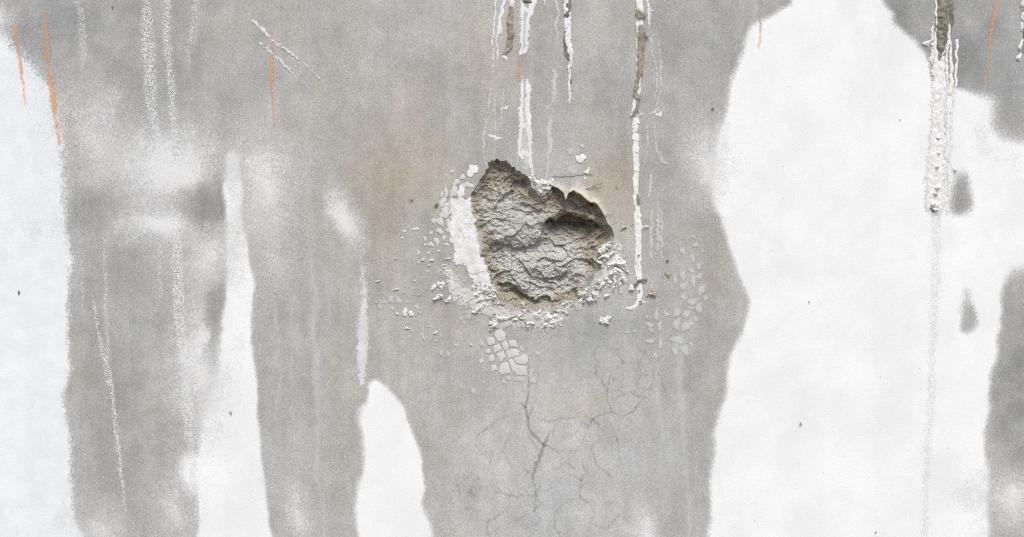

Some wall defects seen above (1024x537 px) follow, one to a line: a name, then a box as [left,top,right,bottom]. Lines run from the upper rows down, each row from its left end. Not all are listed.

rust [47,57,57,126]
damp [81,235,127,512]
damp [140,0,179,154]
damp [157,227,198,521]
damp [296,246,331,537]
damp [355,253,370,386]
spalling [401,159,614,310]
damp [482,0,574,179]
peeling [564,144,590,179]
damp [626,0,668,310]
damp [922,0,959,216]